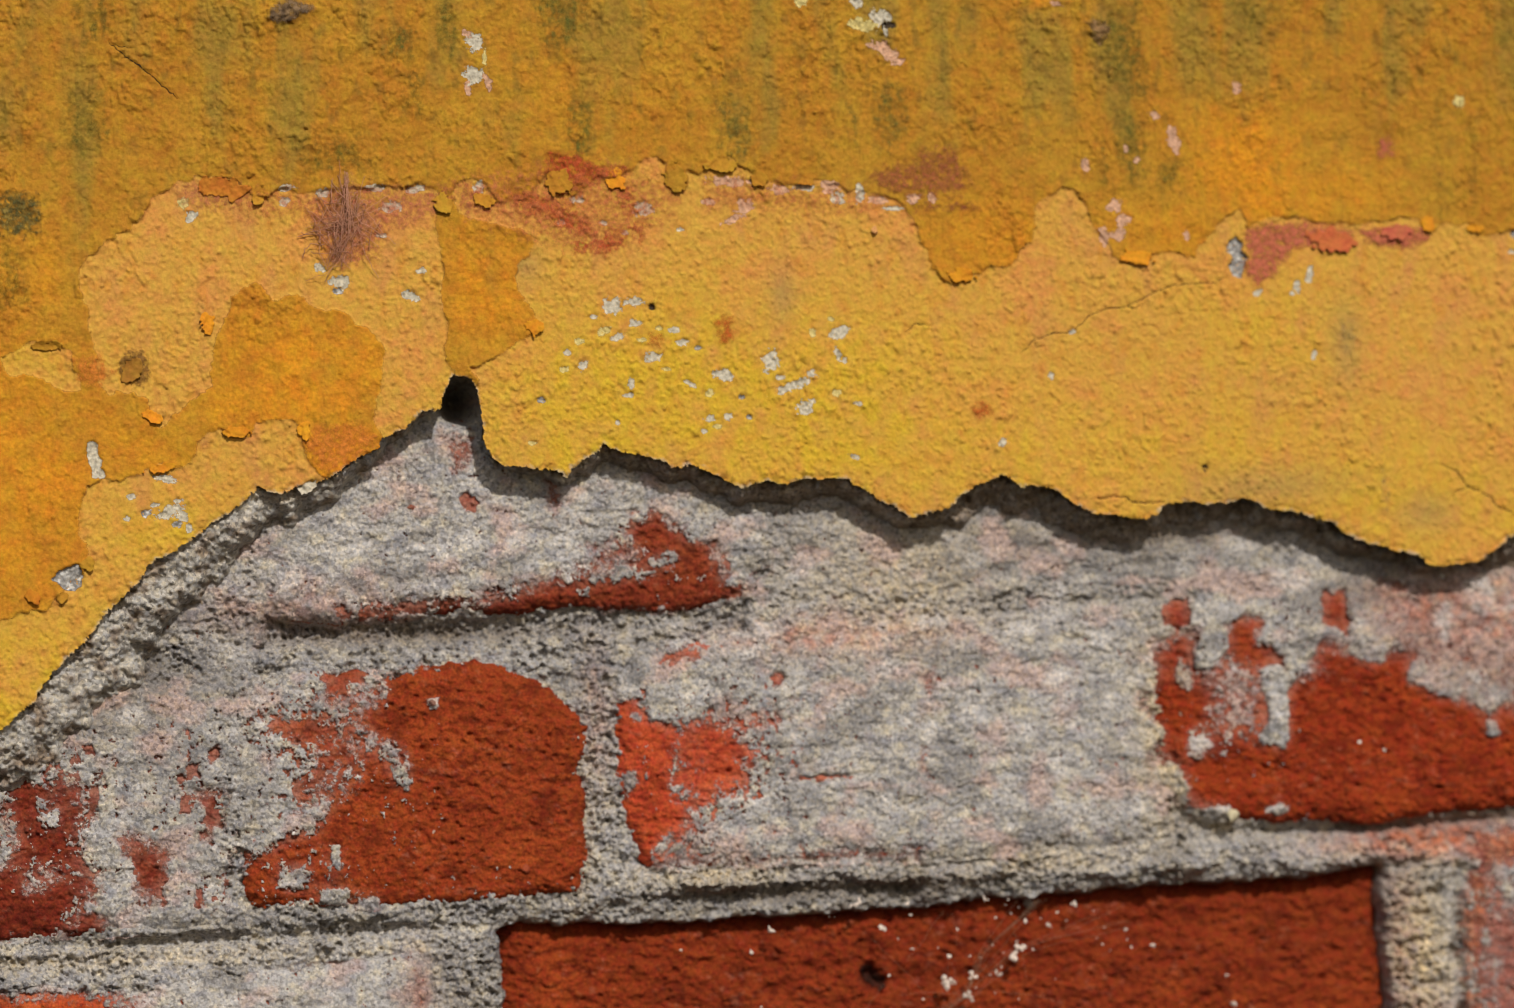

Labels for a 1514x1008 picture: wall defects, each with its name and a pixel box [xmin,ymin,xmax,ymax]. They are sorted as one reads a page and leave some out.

peeling [1453,95,1465,107]
peeling [1150,110,1181,155]
crack [1022,278,1223,352]
peeling [0,155,1514,802]
spalling [860,964,886,990]